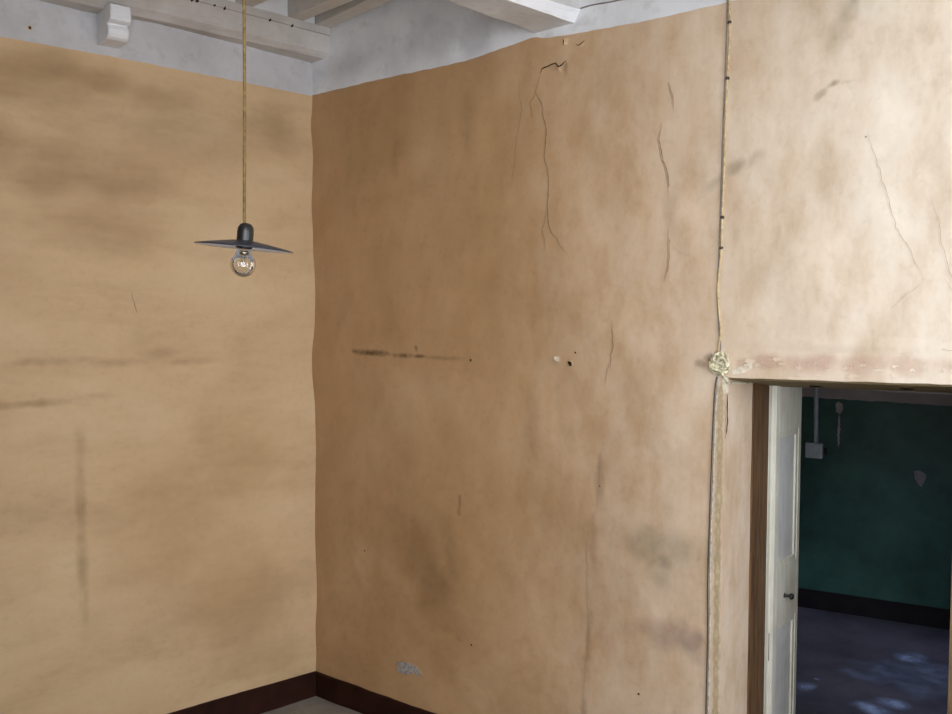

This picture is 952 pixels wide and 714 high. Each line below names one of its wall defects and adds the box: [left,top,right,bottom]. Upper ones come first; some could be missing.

crack [529,71,569,258]
crack [657,81,674,199]
crack [662,226,670,282]
crack [866,128,952,309]
crack [604,320,613,384]
peeling [721,358,759,395]